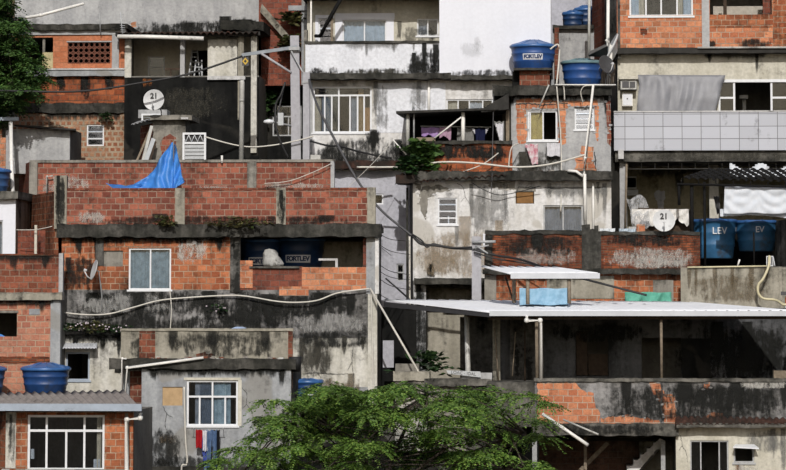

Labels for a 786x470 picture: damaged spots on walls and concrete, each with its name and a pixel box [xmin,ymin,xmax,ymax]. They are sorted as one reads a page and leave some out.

water stain [311,21,439,161]
flaking render [516,97,612,171]
water stain [185,190,347,225]
water stain [546,182,607,209]
water stain [0,255,52,269]
water stain [502,233,578,255]
water stain [607,234,686,246]
water stain [0,300,53,309]
water stain [64,236,368,393]
water stain [542,322,786,434]
flaking render [537,382,678,424]
water stain [152,430,201,467]